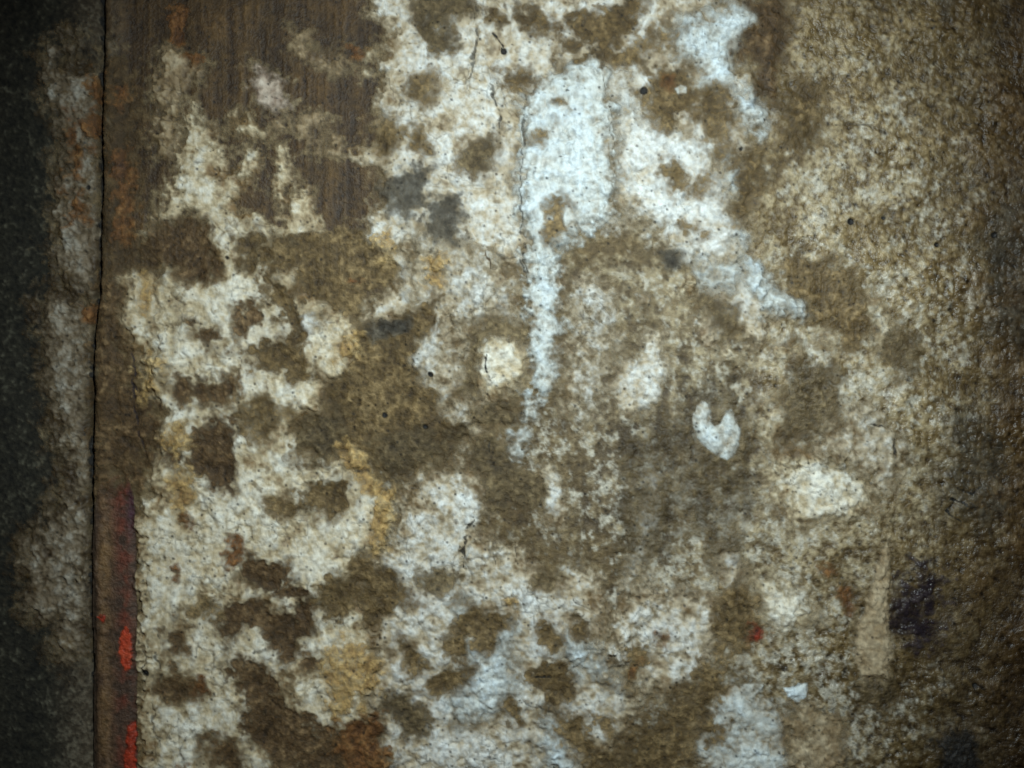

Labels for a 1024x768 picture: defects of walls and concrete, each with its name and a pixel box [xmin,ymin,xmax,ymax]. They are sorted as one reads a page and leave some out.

crack [492,87,526,227]
leakage [525,130,547,145]
crack [88,0,106,617]
leakage [540,196,675,430]
leakage [721,346,746,365]
leakage [519,389,544,423]
leakage [506,429,532,457]
peeling [693,402,741,459]
peeling [784,683,807,701]
peeling [124,721,138,768]